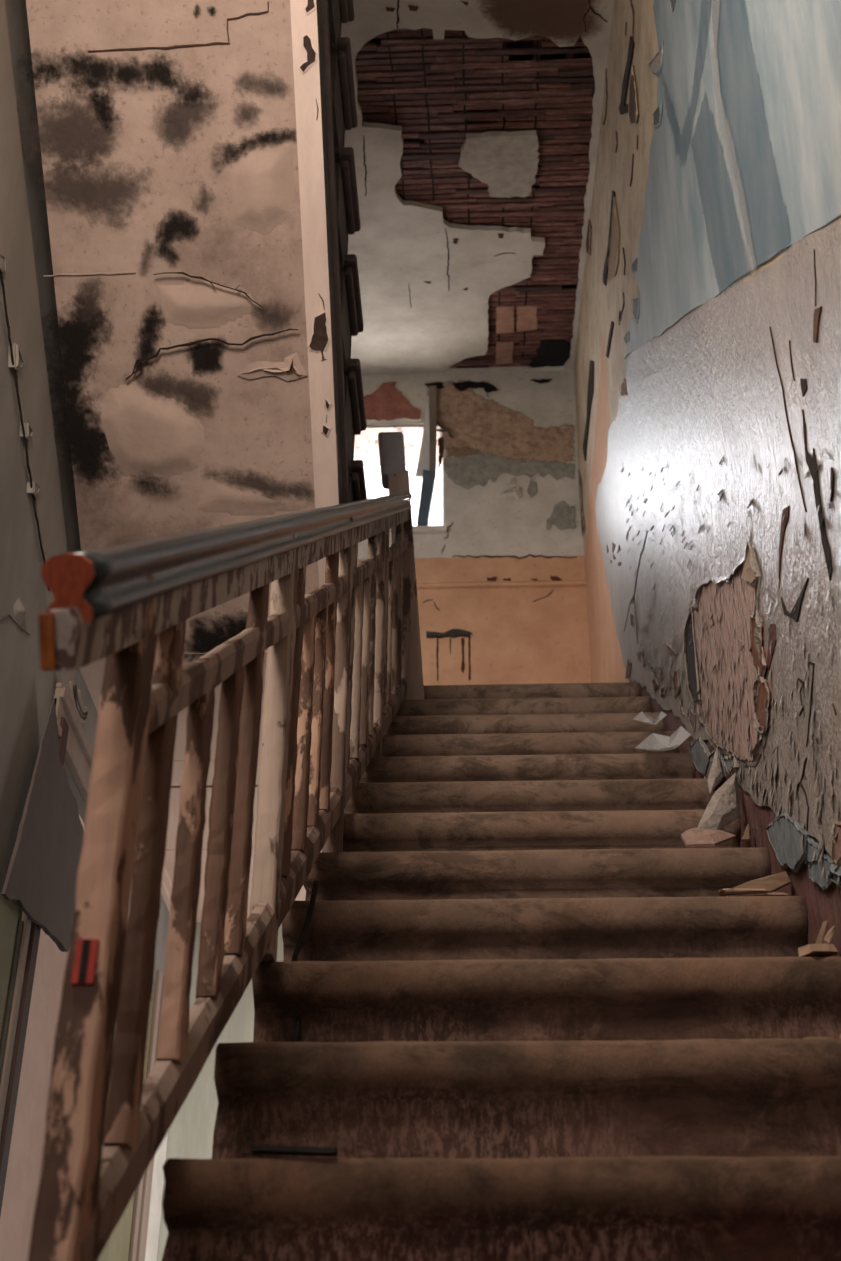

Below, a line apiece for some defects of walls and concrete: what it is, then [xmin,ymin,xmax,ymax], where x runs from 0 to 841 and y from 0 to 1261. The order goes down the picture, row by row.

crack [88,2,269,51]
water stain [483,0,597,43]
water stain [20,53,214,224]
water stain [214,129,295,166]
water stain [44,283,116,485]
crack [44,272,298,380]
water stain [142,189,211,269]
water stain [136,305,225,414]
flaking render [355,28,640,536]
peeling [813,306,822,343]
water stain [213,472,312,499]
flaking render [607,379,841,894]